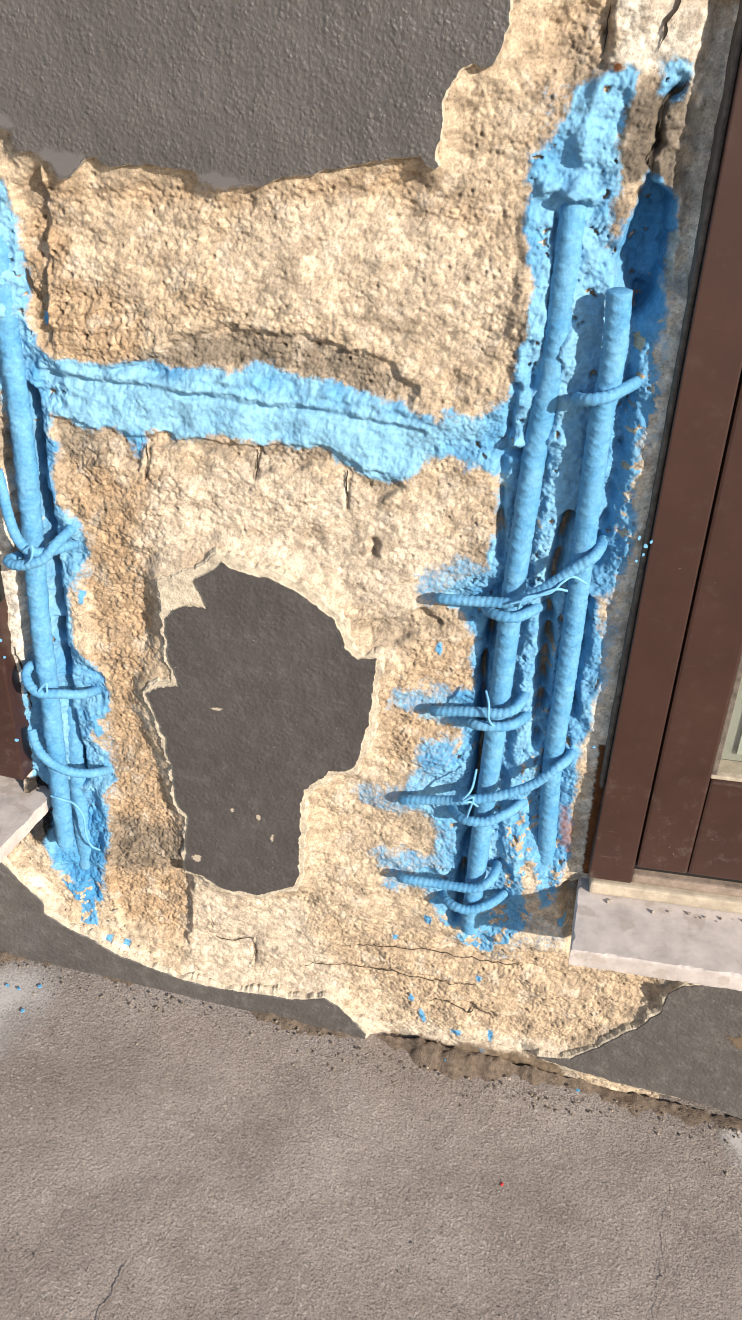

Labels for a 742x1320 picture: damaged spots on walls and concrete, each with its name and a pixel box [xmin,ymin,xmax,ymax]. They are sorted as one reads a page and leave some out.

crack [603,5,611,52]
crack [657,0,681,52]
crack [649,79,688,175]
spalling [0,0,716,1063]
spalling [555,1064,660,1099]